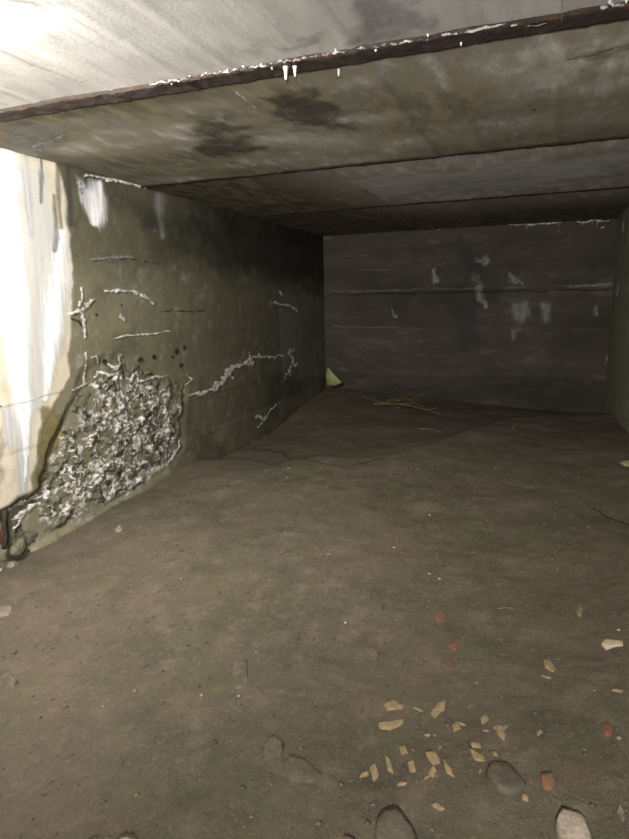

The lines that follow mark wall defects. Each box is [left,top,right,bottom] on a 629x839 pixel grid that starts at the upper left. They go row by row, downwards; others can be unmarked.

leakage [442,23,516,46]
leakage [0,123,147,492]
crack [73,310,204,391]
crack [185,352,285,396]
spalling [0,357,184,571]